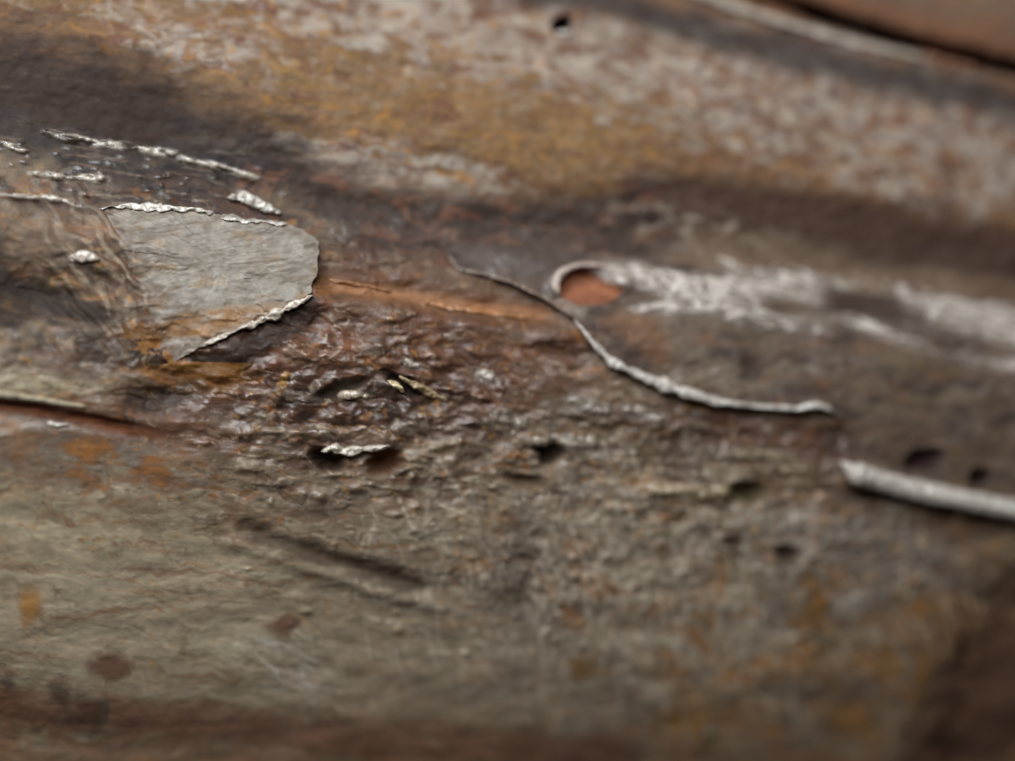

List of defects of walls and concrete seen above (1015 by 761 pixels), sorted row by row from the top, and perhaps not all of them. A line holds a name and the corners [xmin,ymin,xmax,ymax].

peeling [99,201,320,362]
spalling [308,366,425,405]
spalling [497,442,571,492]
spalling [725,477,779,509]
spalling [898,444,952,476]
spalling [966,465,996,490]
corrosion [275,618,297,635]
corrosion [91,655,126,677]